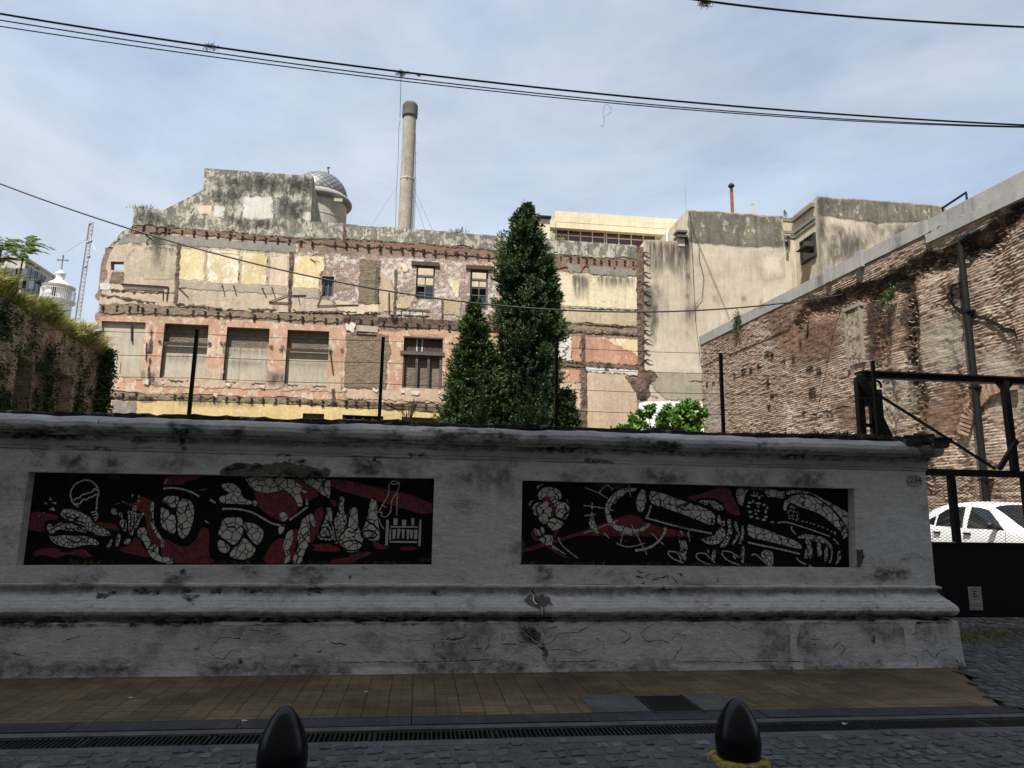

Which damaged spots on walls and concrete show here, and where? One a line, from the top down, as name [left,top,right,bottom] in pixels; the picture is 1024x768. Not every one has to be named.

leakage [213,177,309,215]
flaking render [133,226,498,258]
peeling [219,461,331,480]
flaking render [524,594,552,608]
crack [209,586,846,664]